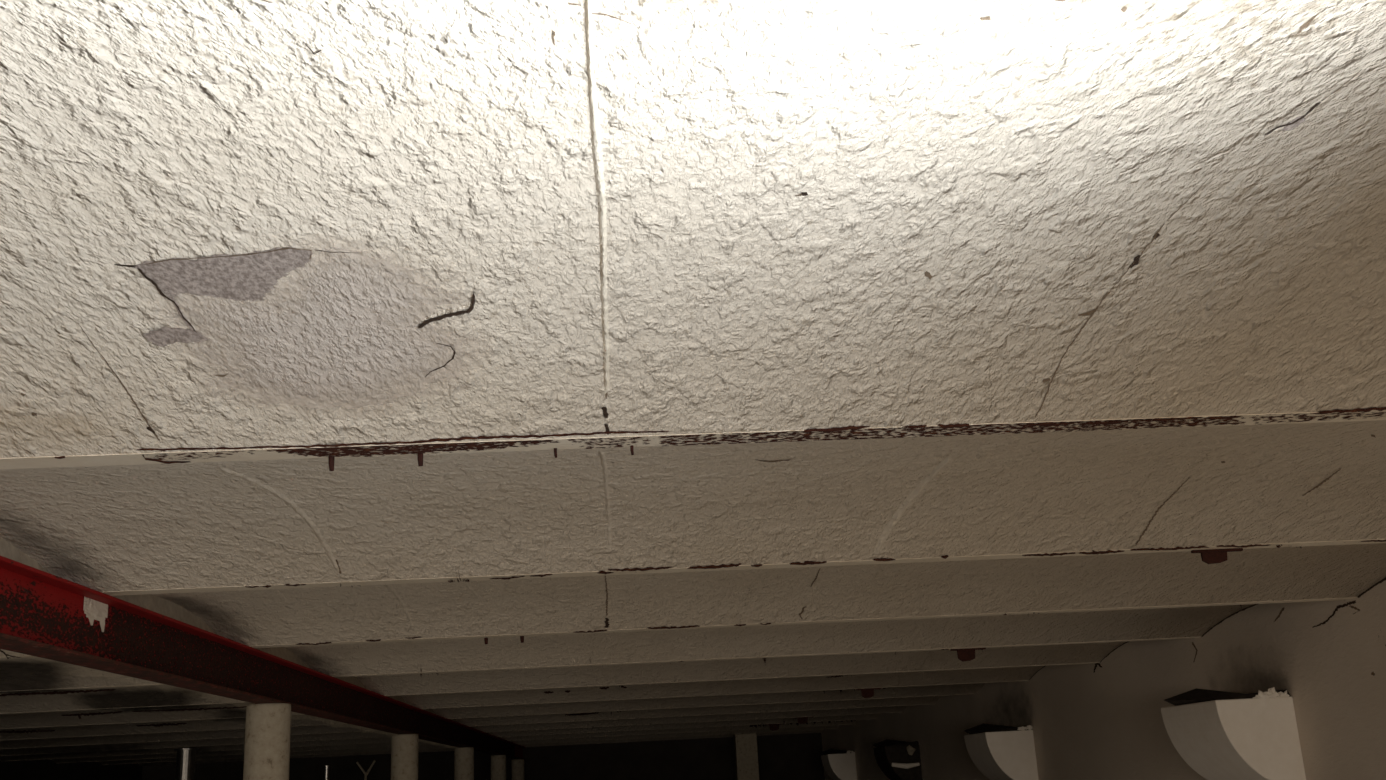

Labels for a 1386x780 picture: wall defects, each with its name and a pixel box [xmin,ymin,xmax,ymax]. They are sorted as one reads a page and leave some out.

crack [1265,70,1361,135]
peeling [114,247,350,347]
crack [1035,179,1208,417]
crack [79,325,161,443]
rust [137,407,1386,464]
crack [1135,478,1189,544]
rust [598,563,762,574]
rust [0,571,515,757]